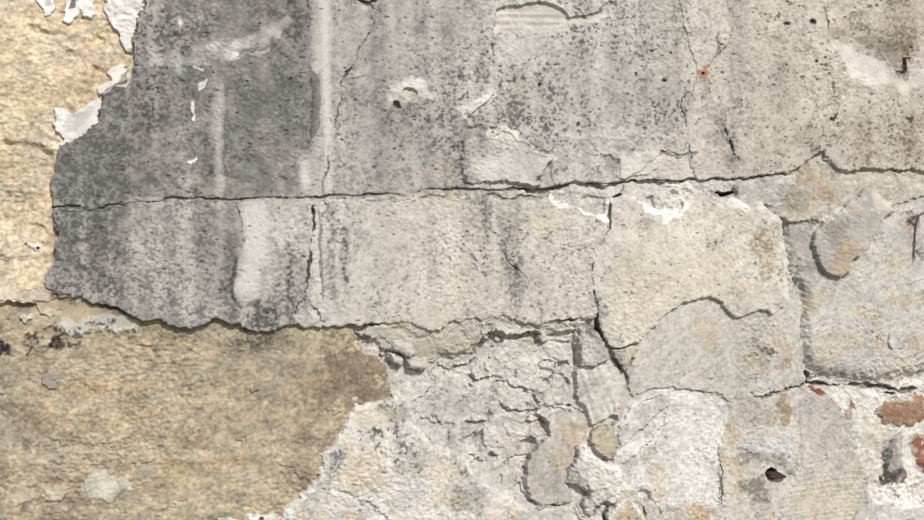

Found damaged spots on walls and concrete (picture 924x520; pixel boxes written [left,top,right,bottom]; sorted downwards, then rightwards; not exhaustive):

flaking render [33,206,140,338]
peeling [36,0,146,151]
water stain [50,122,141,296]
water stain [182,0,352,332]
crack [48,0,787,385]
flaking render [454,88,497,126]
flaking render [489,0,618,40]
corrosion [696,66,712,94]
crack [411,363,453,392]
crack [523,384,589,416]
crack [749,273,924,400]
crack [529,500,573,509]